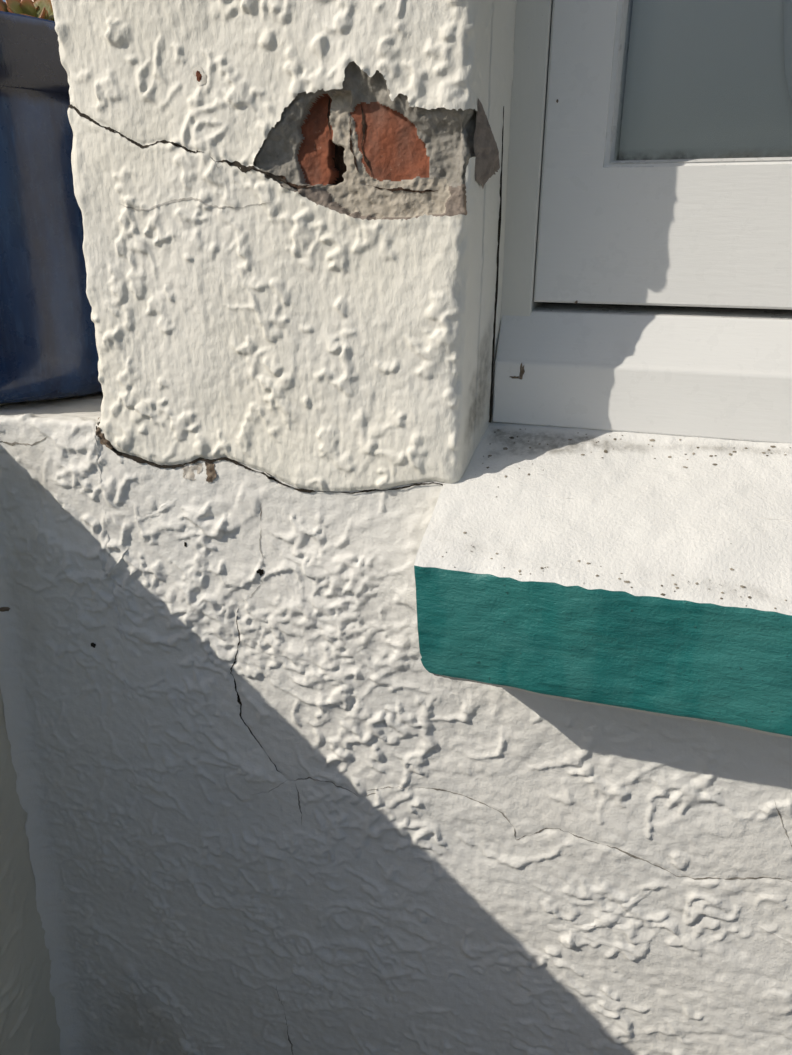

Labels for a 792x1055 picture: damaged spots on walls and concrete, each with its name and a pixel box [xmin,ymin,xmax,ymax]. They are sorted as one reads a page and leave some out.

crack [69,104,287,211]
spalling [253,61,500,220]
crack [96,417,444,494]
crack [230,508,792,882]